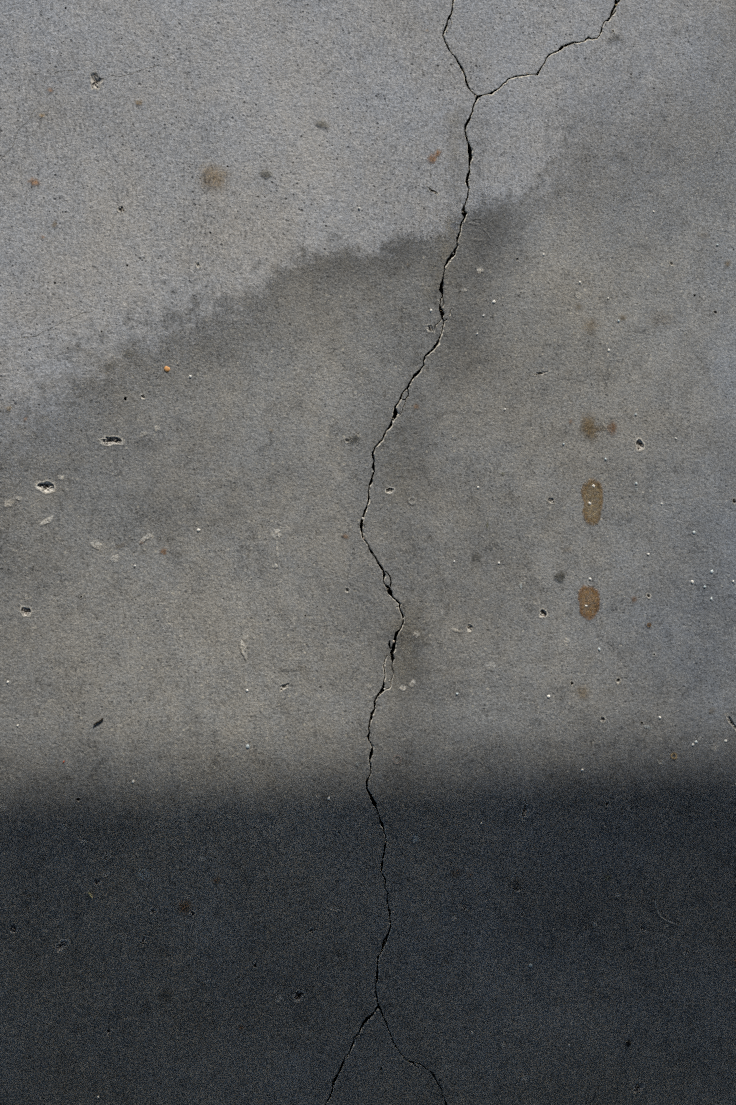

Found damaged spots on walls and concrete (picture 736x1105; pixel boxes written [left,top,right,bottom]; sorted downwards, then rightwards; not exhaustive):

water stain [583,482,602,523]
crack [325,0,621,1105]
water stain [580,588,599,610]